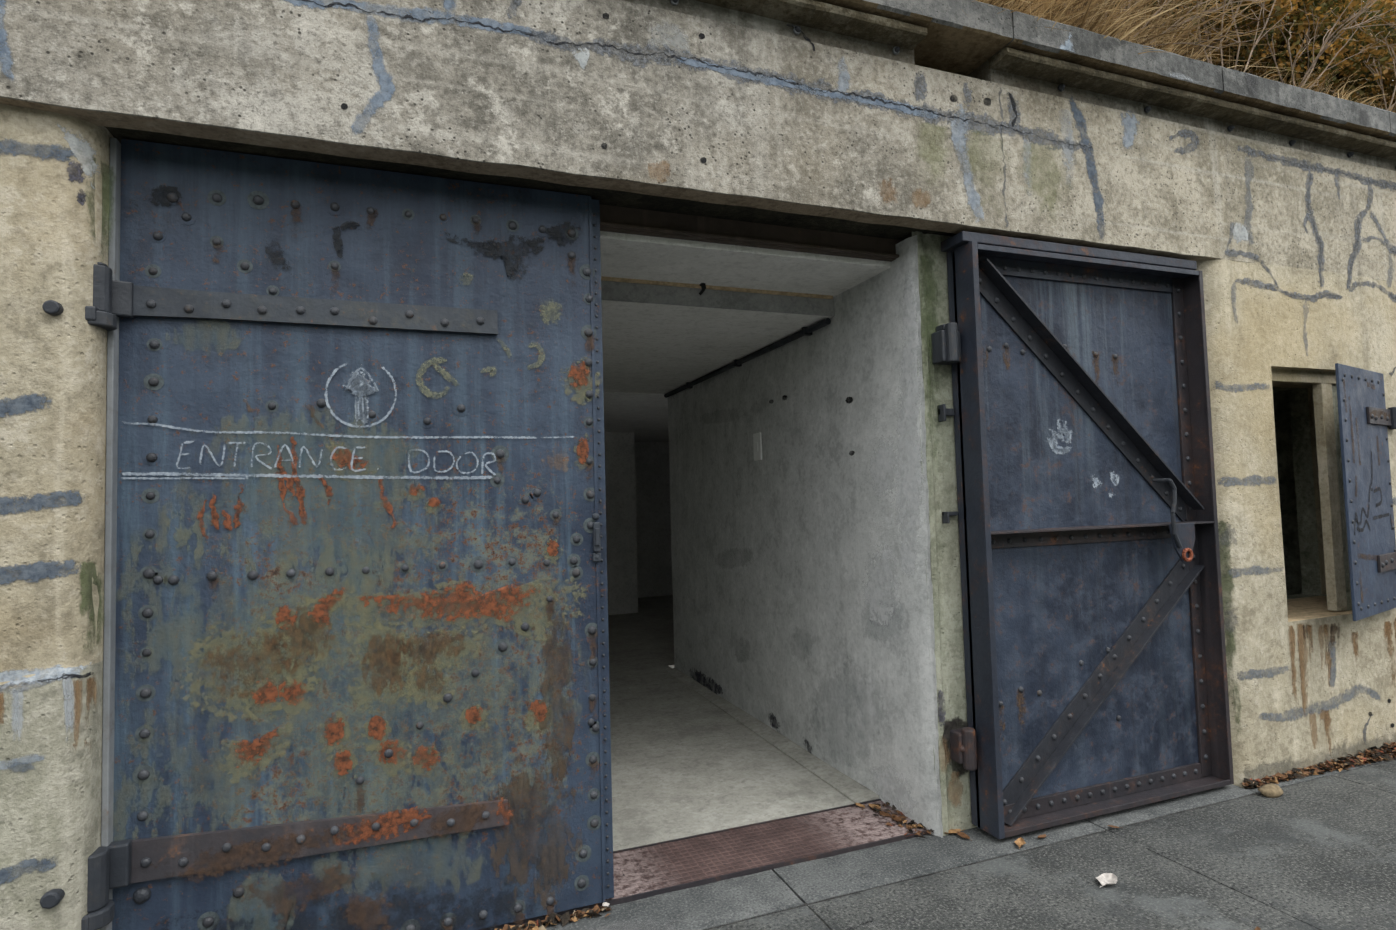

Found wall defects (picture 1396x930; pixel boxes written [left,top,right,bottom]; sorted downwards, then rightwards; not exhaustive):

crack [284,0,1106,238]
crack [0,139,77,162]
crack [1225,145,1396,355]
crack [0,490,82,516]
corrosion [197,488,244,539]
corrosion [276,436,307,525]
corrosion [331,447,369,472]
crack [0,559,81,585]
corrosion [202,581,575,776]
corrosion [1289,623,1359,712]
corrosion [334,791,513,849]
crack [0,858,56,885]